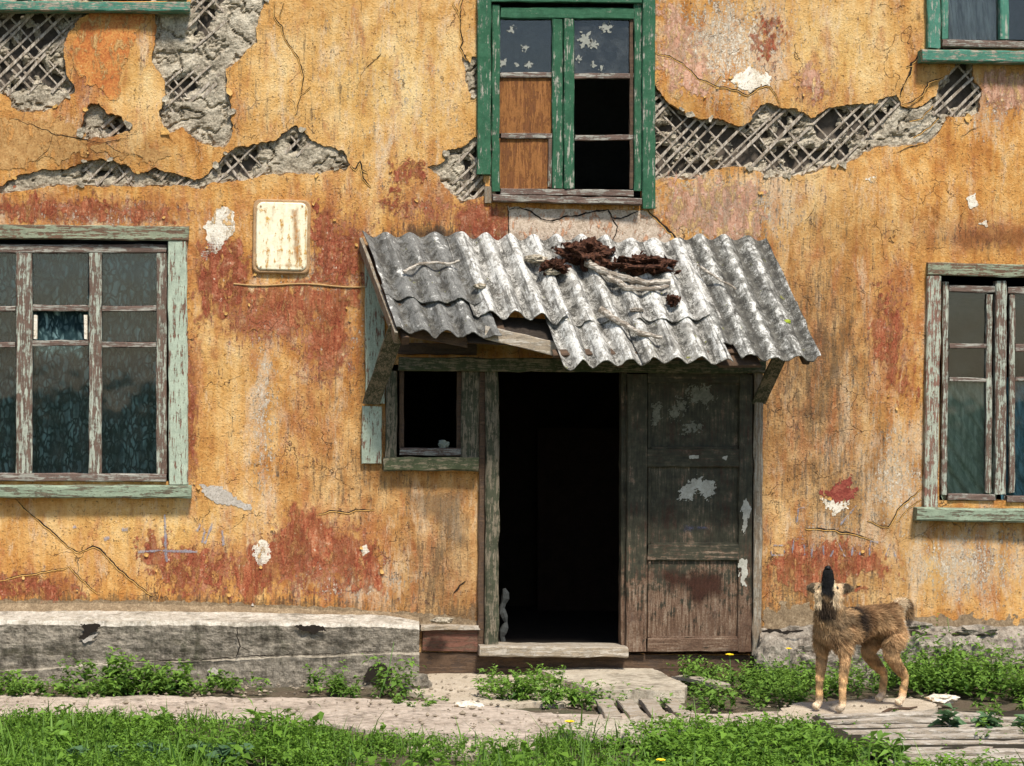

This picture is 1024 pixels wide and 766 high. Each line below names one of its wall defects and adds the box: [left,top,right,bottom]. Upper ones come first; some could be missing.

spalling [0,0,350,226]
crack [273,3,311,115]
spalling [378,0,1024,243]
crack [507,206,677,241]
peeling [188,198,365,366]
crack [0,499,152,596]
peeling [188,395,252,510]
peeling [0,501,478,631]
peeling [819,474,858,516]
crack [805,488,922,541]
spalling [79,623,101,643]